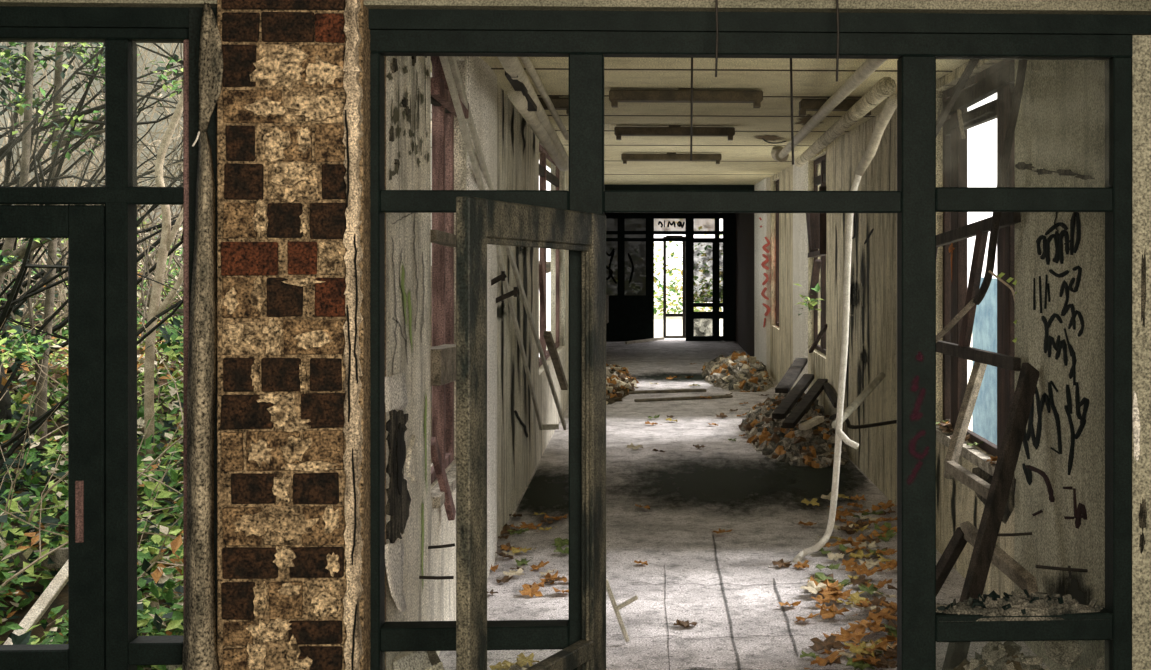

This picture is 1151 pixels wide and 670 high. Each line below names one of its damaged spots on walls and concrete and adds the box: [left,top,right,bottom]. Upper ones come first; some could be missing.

peeling [386,56,429,180]
flaking render [221,0,363,670]
flaking render [385,373,421,613]
crack [712,535,741,670]